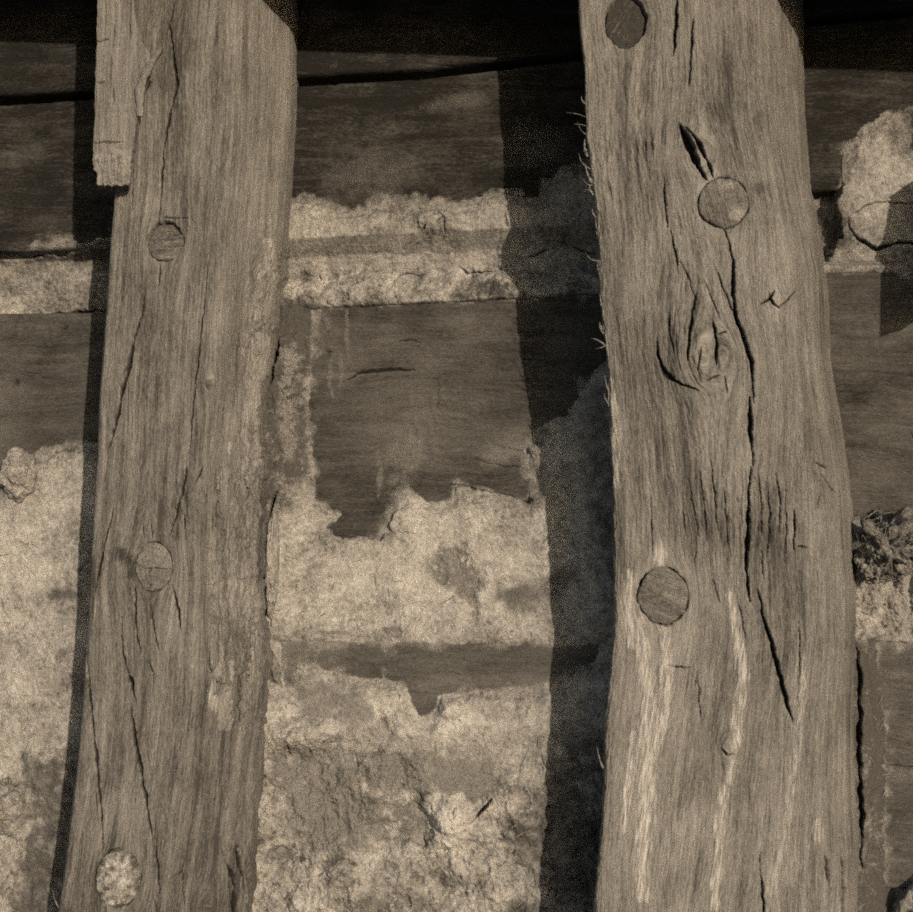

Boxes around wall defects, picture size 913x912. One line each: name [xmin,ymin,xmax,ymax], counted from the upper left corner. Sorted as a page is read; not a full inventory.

crack [160,2,179,219]
crack [679,127,712,178]
crack [848,201,913,251]
crack [114,310,145,433]
crack [657,179,803,718]
crack [122,588,158,696]
crack [90,688,104,835]
crack [133,718,186,904]